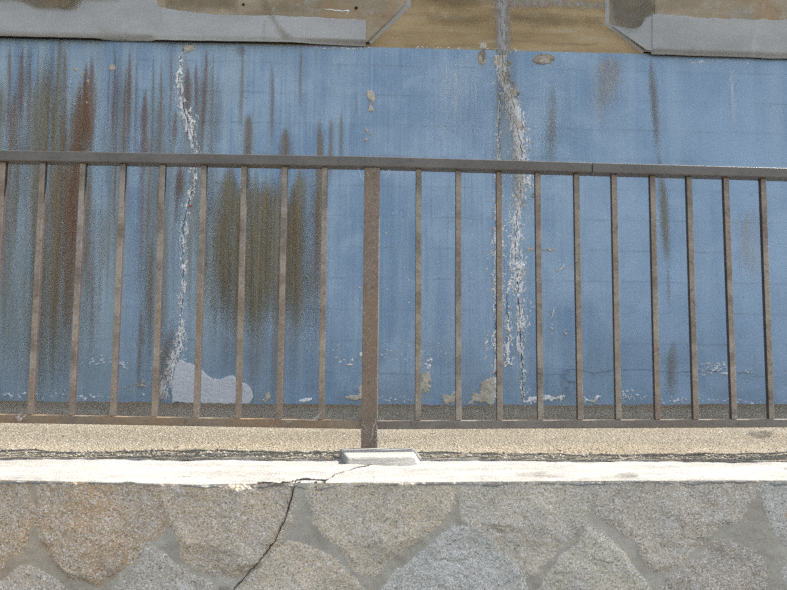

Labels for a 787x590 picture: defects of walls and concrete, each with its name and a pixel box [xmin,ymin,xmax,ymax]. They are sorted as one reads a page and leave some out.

rust [78,67,93,152]
peeling [171,360,272,404]
peeling [469,376,496,405]
crack [234,464,372,590]